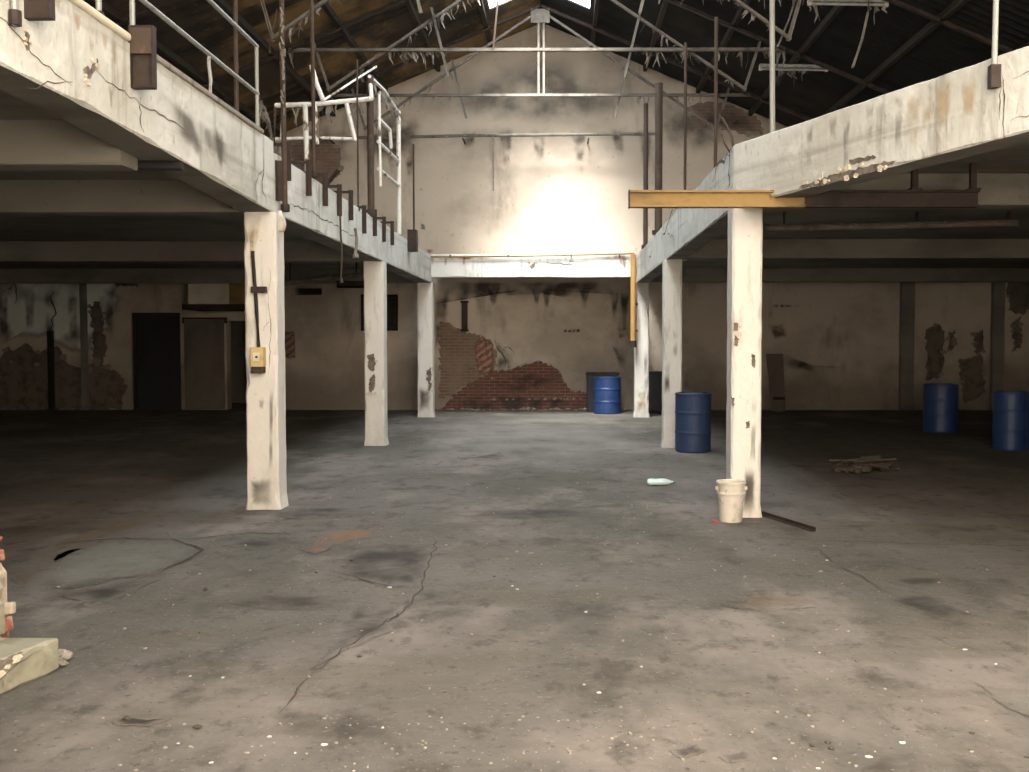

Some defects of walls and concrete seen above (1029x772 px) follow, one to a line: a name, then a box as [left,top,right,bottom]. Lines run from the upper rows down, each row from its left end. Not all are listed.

spalling [83,57,100,85]
crack [95,69,184,132]
crack [999,71,1029,141]
spalling [800,155,895,189]
leakage [459,283,512,302]
leakage [533,283,595,304]
leakage [612,296,628,313]
peeling [1005,282,1029,352]
peeling [420,321,587,410]
peeling [925,323,987,403]
flaking render [0,616,14,638]
crack [279,538,437,713]